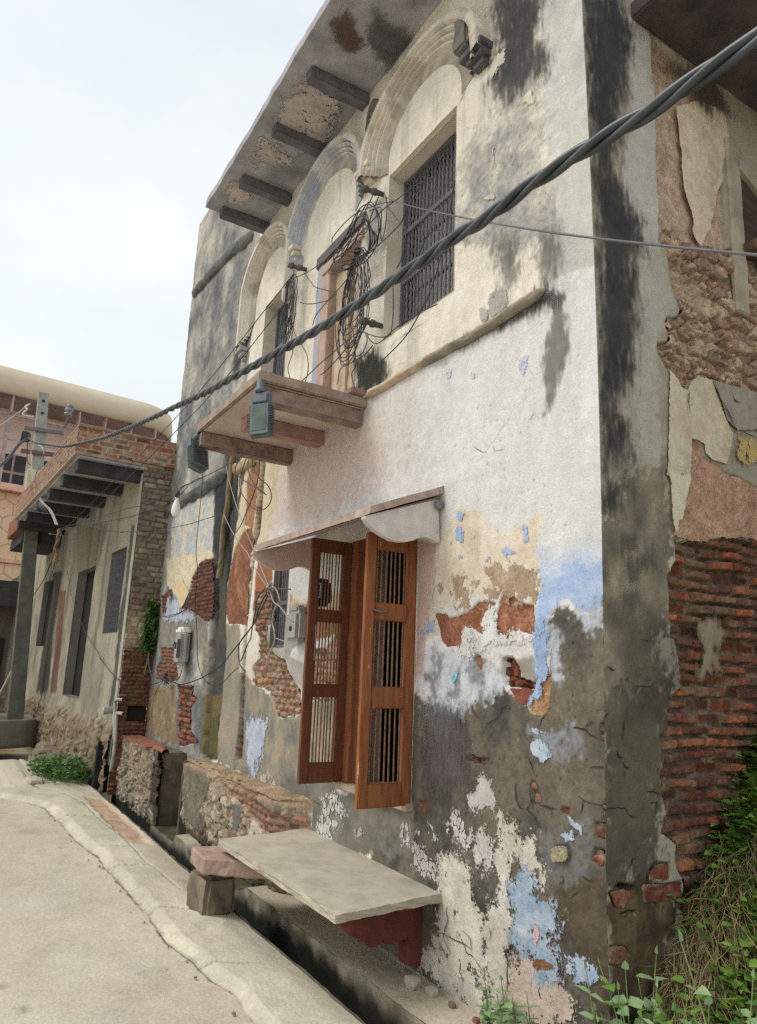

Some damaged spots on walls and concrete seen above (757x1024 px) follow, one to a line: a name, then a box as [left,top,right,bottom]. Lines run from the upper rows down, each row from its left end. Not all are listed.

peeling [272,74,344,144]
damp [487,0,549,106]
damp [584,0,634,136]
damp [353,348,387,393]
damp [591,137,645,512]
peeling [455,511,465,559]
flaking render [610,93,757,945]
flaking render [156,462,337,785]
flaking render [419,525,552,763]
crack [515,760,660,829]
crack [574,714,630,769]
peeling [398,755,602,1024]